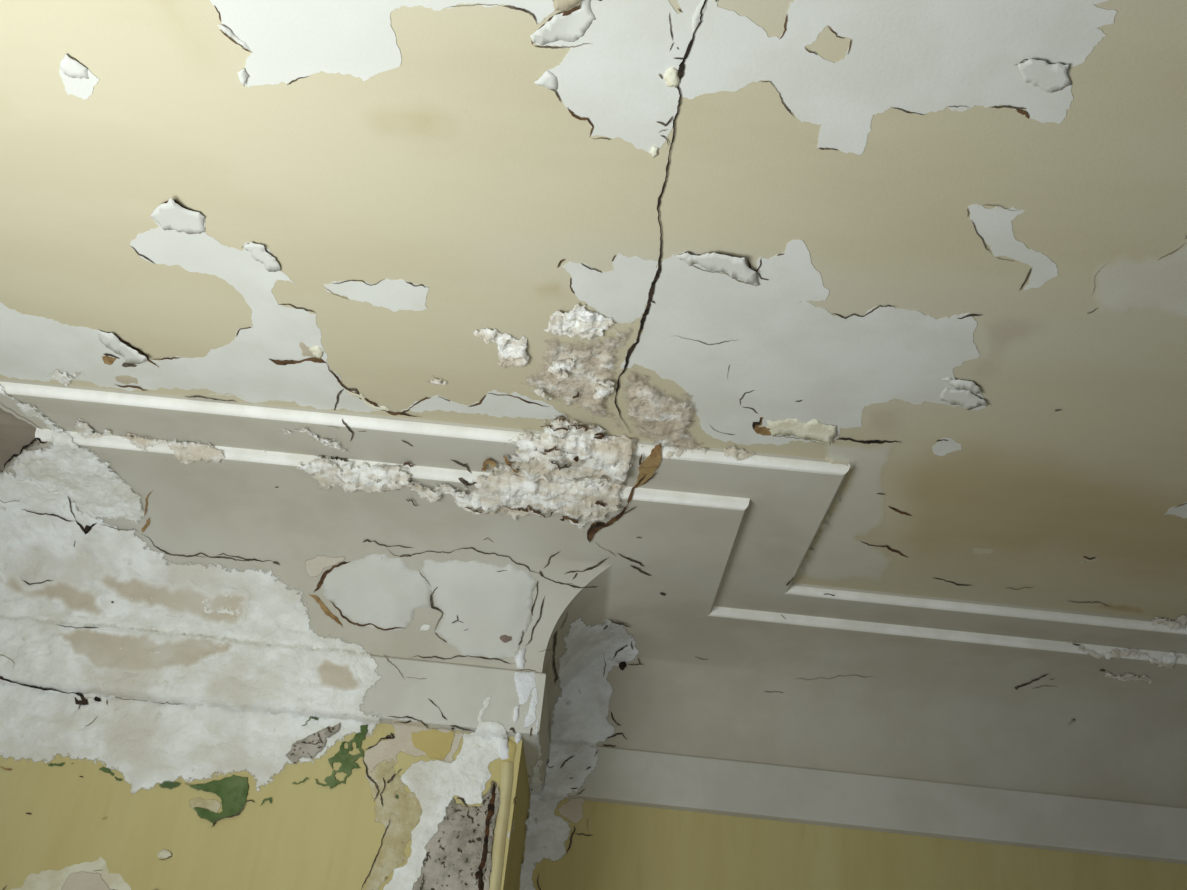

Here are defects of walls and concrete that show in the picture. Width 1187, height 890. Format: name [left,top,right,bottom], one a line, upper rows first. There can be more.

peeling [210,0,1117,155]
peeling [967,204,1058,291]
peeling [0,198,987,584]
crack [361,0,717,890]
damp [839,400,1187,616]
flaking render [0,570,249,674]
crack [0,654,188,726]
flaking render [312,655,368,695]
crack [1014,674,1057,690]
spalling [285,723,341,764]
flaking render [364,696,509,890]
peeling [2,857,131,890]